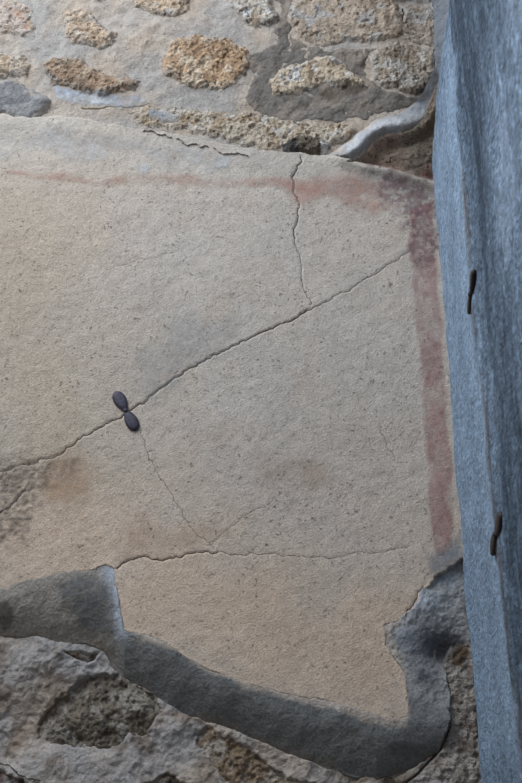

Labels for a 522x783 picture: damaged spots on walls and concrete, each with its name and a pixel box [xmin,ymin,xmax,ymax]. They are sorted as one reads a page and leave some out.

flaking render [0,0,435,156]
crack [0,156,407,513]
crack [117,433,406,569]
flaking render [0,636,481,783]